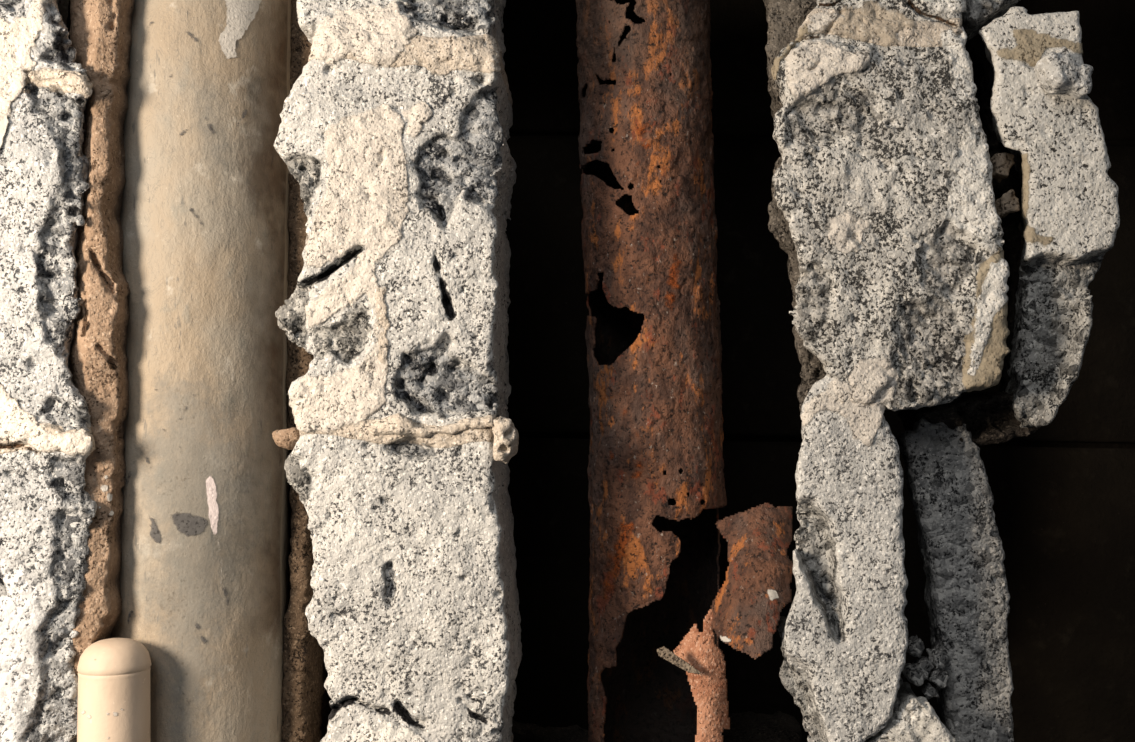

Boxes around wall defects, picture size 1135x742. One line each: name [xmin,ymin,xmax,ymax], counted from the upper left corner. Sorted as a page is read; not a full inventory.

crack [907,0,1022,392]
crack [301,249,361,288]
crack [432,256,455,321]
spalling [284,454,311,504]